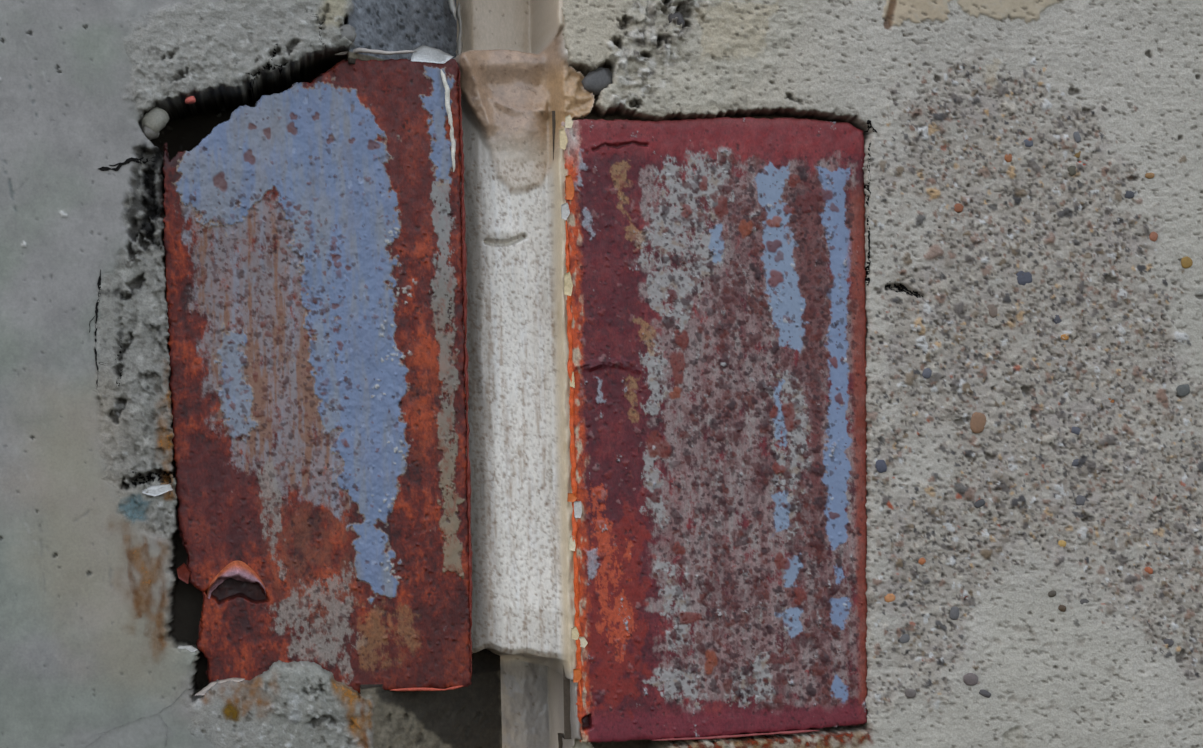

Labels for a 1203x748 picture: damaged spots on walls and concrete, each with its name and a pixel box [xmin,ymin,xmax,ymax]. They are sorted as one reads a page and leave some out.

spalling [581,0,817,120]
peeling [882,0,1064,27]
spalling [92,0,456,540]
corrosion [391,71,473,691]
spalling [862,40,1203,722]
corrosion [566,295,582,712]
corrosion [207,560,267,599]
spalling [180,660,393,748]
corrosion [654,730,872,748]